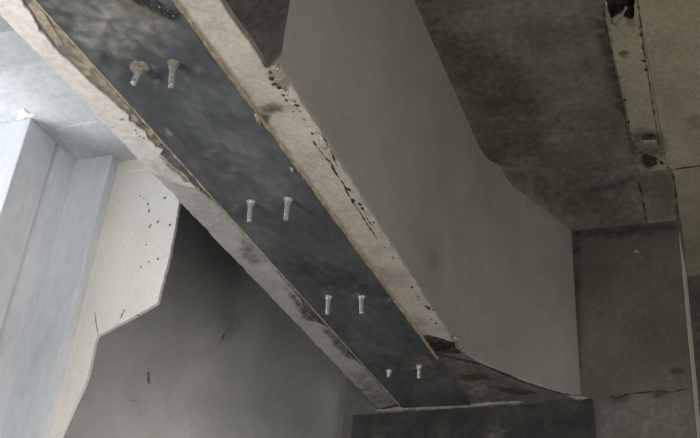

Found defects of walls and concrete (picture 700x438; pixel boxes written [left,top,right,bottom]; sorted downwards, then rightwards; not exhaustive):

spalling [604,0,635,26]
crack [311,132,377,239]
crack [606,388,689,399]